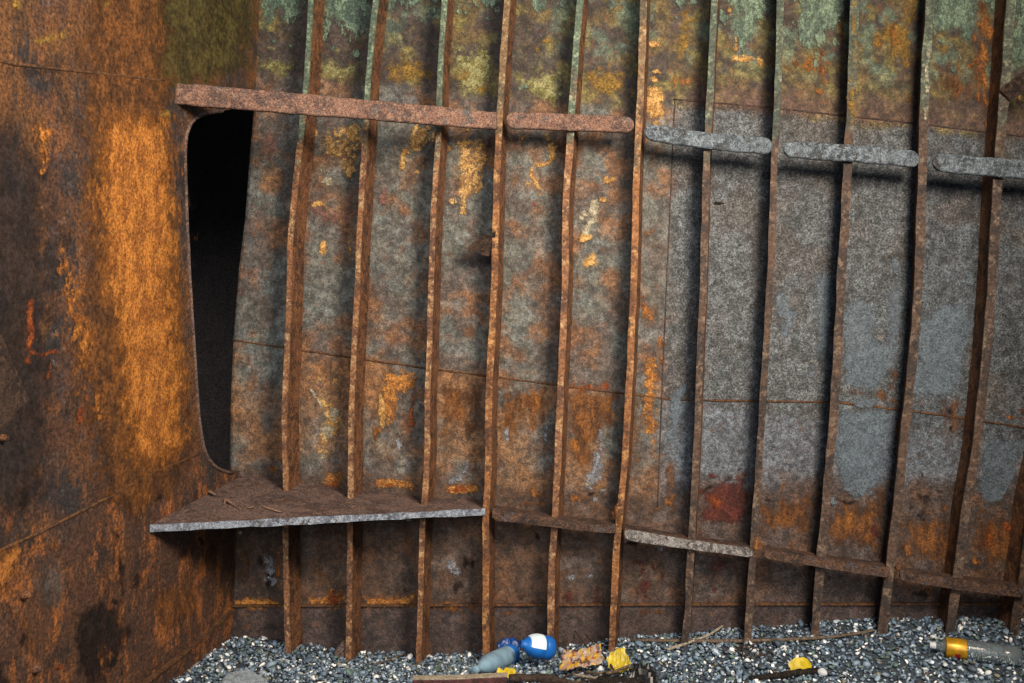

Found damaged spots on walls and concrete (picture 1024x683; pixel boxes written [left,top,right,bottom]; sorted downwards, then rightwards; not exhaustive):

rust [315,122,362,185]
rust [394,124,435,174]
rust [447,128,488,215]
rust [25,0,192,518]
rust [310,376,341,459]
rust [373,369,417,440]
rust [568,382,619,467]
rust [376,439,415,490]
rust [447,462,480,494]
rust [700,468,748,524]
rust [829,492,884,549]
damp [76,552,140,683]